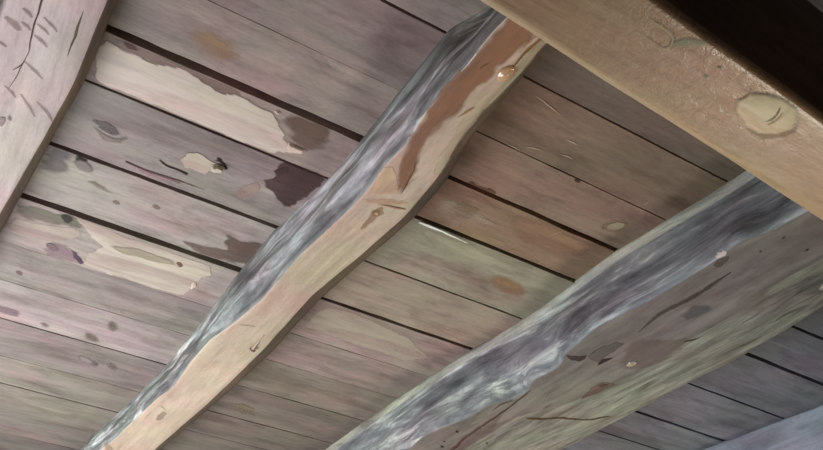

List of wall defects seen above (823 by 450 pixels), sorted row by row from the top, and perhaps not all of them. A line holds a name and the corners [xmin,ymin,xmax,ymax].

crack [9,0,43,88]
crack [67,13,83,57]
peeling [95,40,305,154]
damp [398,19,533,189]
damp [94,120,127,143]
peeling [159,153,227,175]
damp [265,162,324,207]
damp [19,206,80,228]
damp [46,243,83,264]
peeling [10,218,211,295]
damp [184,236,262,263]
damp [514,219,587,252]